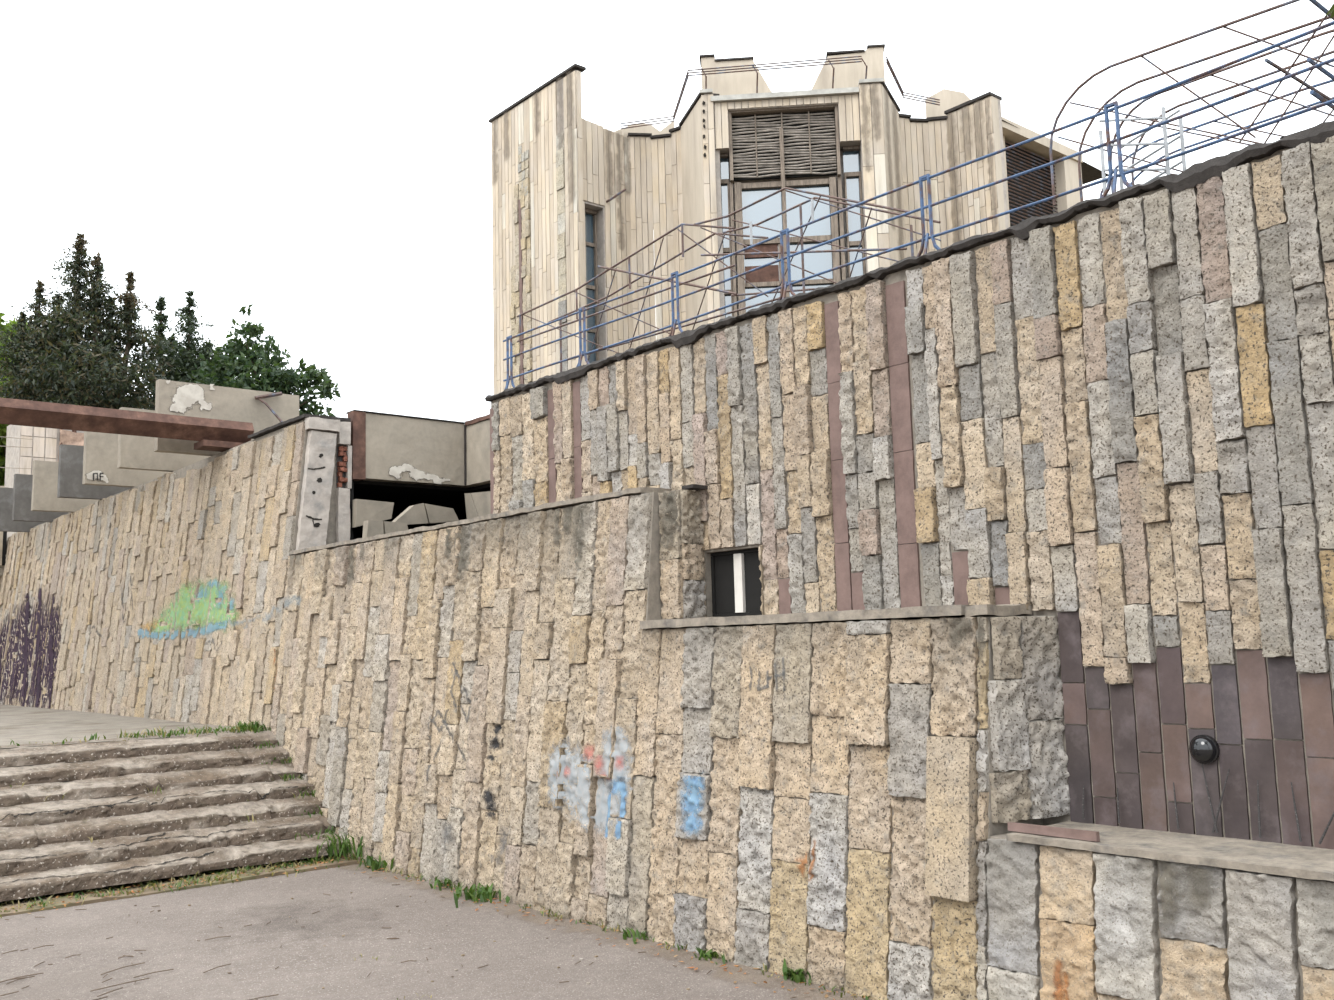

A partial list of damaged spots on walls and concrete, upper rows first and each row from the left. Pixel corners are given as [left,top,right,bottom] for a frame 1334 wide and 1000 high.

peeling [166,380,215,414]
peeling [389,463,450,484]